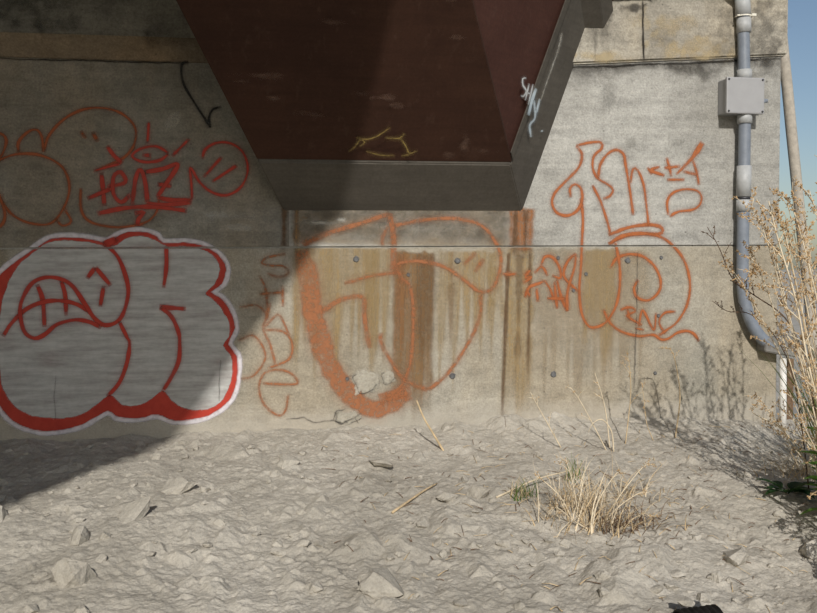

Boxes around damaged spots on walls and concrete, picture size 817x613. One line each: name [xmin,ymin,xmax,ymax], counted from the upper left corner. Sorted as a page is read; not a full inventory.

corrosion [394,251,433,395]
corrosion [502,209,533,393]